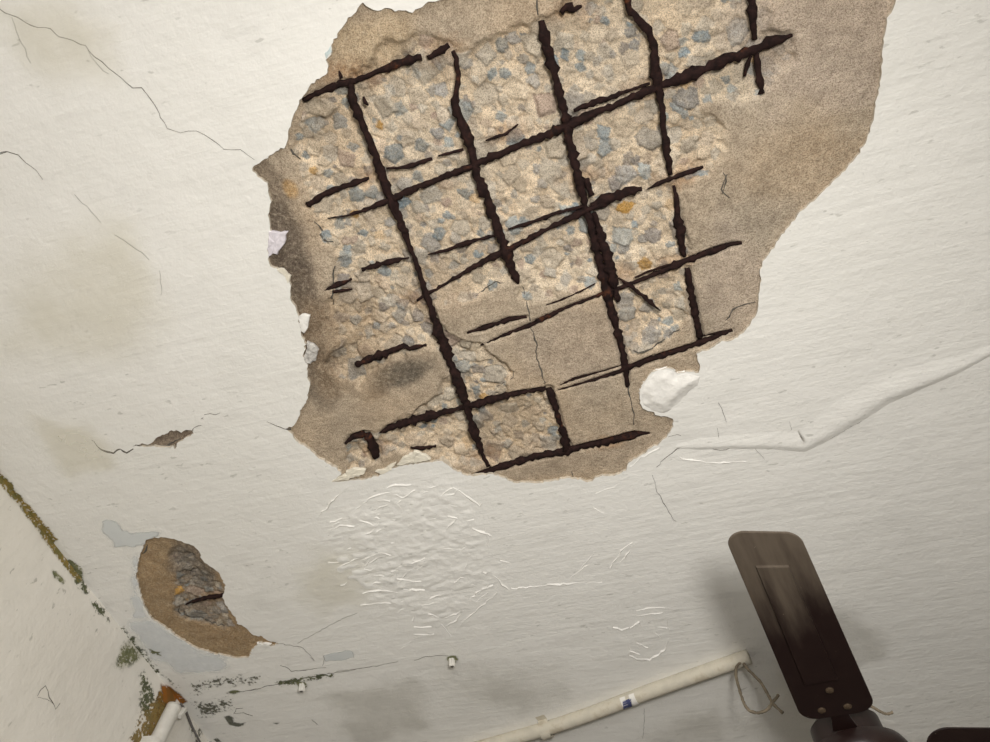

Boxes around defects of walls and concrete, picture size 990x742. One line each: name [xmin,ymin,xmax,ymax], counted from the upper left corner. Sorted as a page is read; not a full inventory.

crack [0,9,253,159]
spalling [253,0,894,482]
crack [92,440,140,454]
spalling [102,520,276,657]